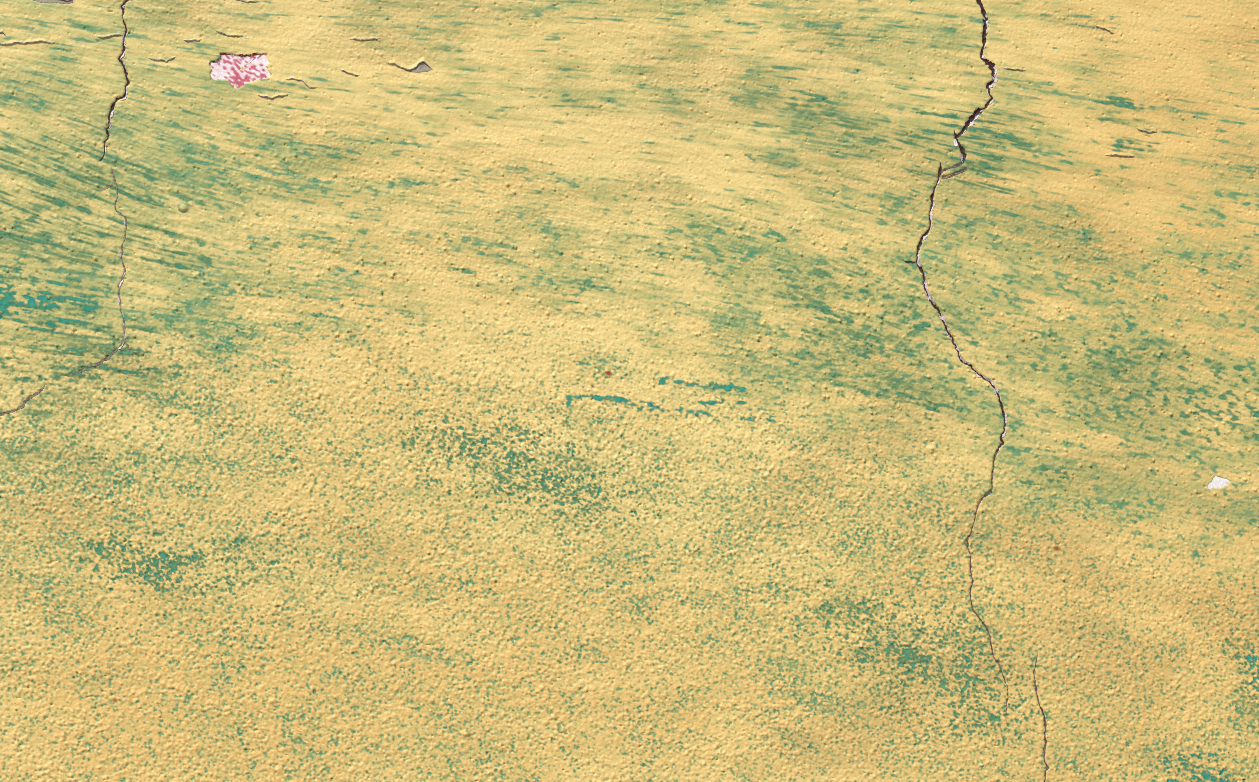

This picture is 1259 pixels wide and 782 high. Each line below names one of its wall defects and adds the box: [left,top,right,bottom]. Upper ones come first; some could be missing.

peeling [0,28,56,45]
peeling [209,53,317,99]
crack [0,0,137,416]
crack [902,0,1049,782]
peeling [1208,476,1230,489]